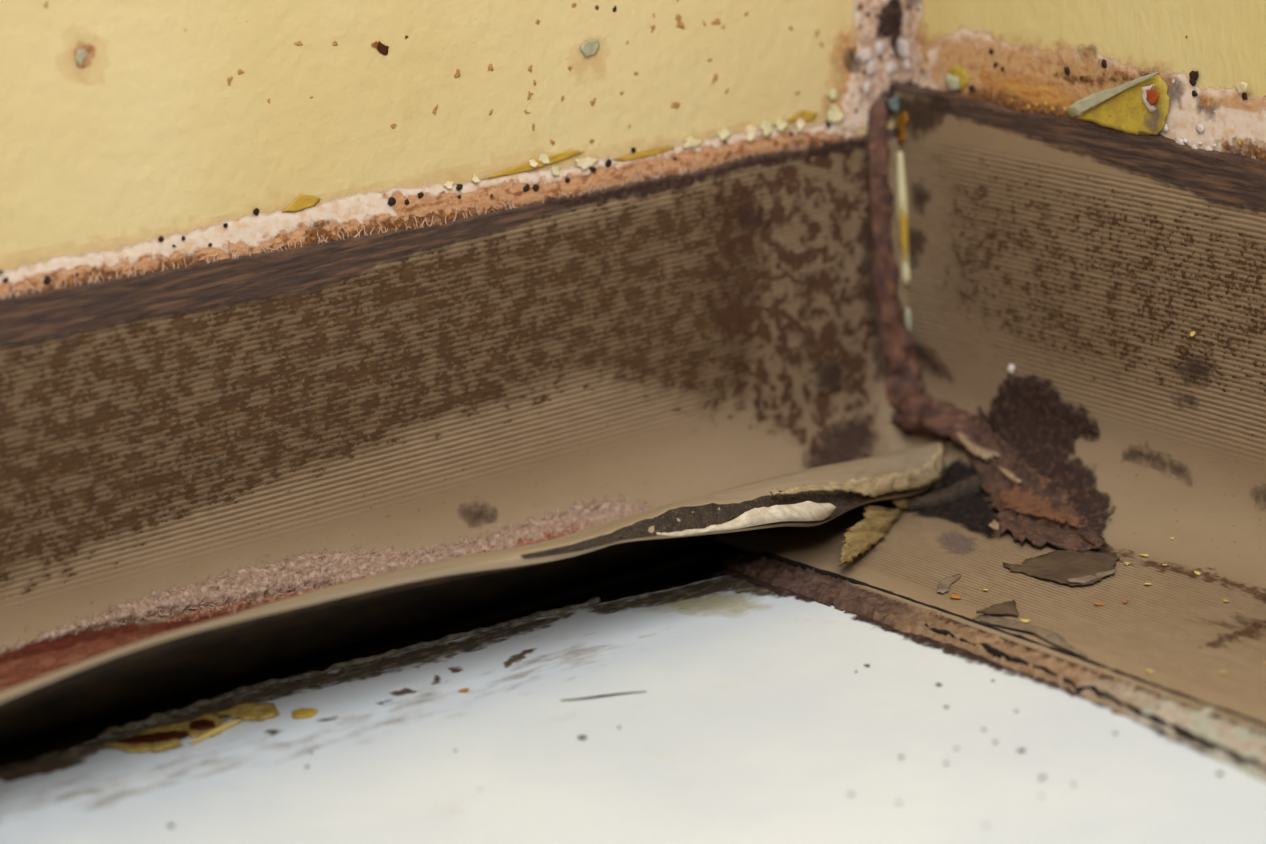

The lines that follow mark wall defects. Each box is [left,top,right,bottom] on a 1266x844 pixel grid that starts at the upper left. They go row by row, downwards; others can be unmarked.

peeling [0,0,1266,299]
damp [2,494,651,653]
damp [0,138,885,594]
damp [844,611,1119,714]
rust [997,487,1082,527]
damp [898,95,1266,552]